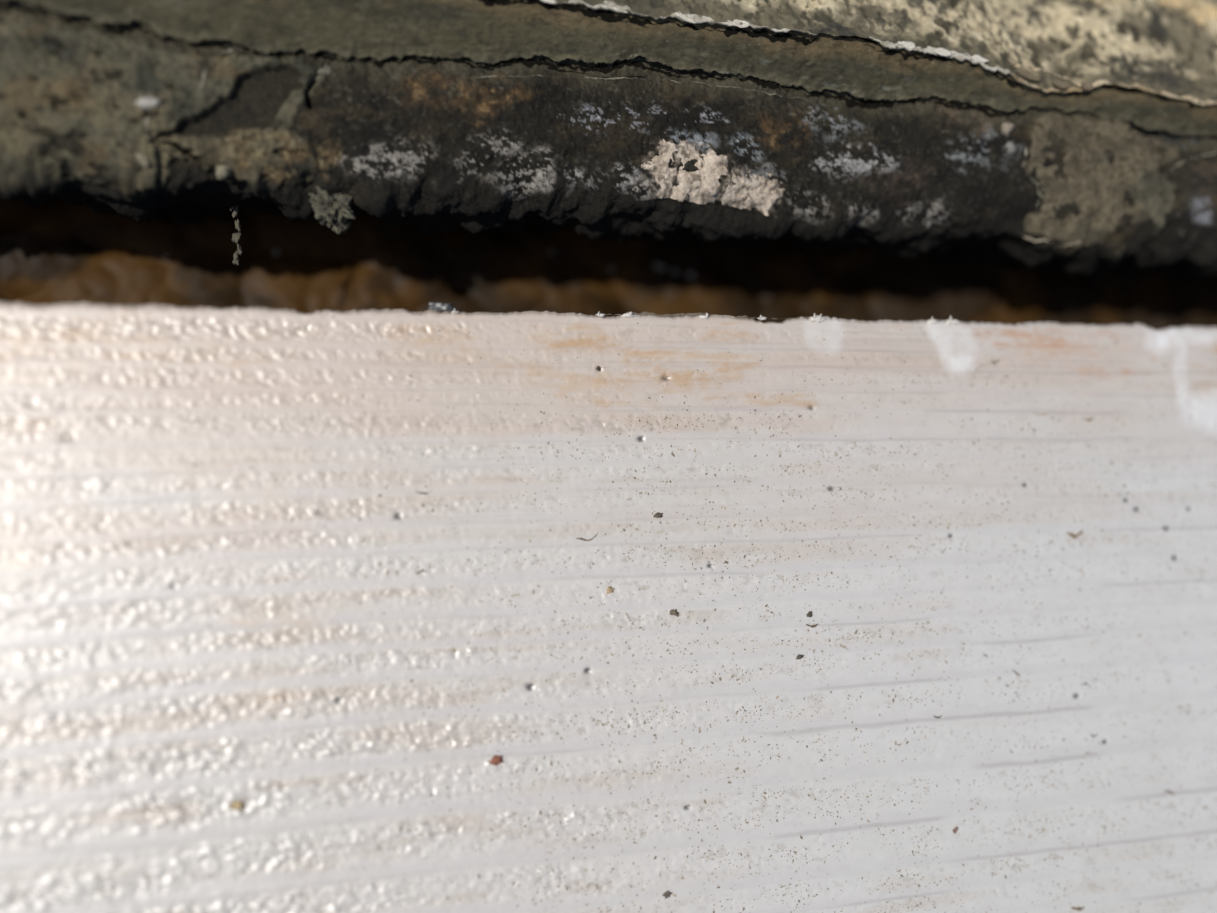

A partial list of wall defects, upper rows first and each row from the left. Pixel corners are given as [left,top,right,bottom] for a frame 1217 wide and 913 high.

peeling [541,0,817,36]
peeling [1155,0,1217,29]
crack [0,0,1027,118]
peeling [869,36,1217,106]
efflorescence [332,87,1033,233]